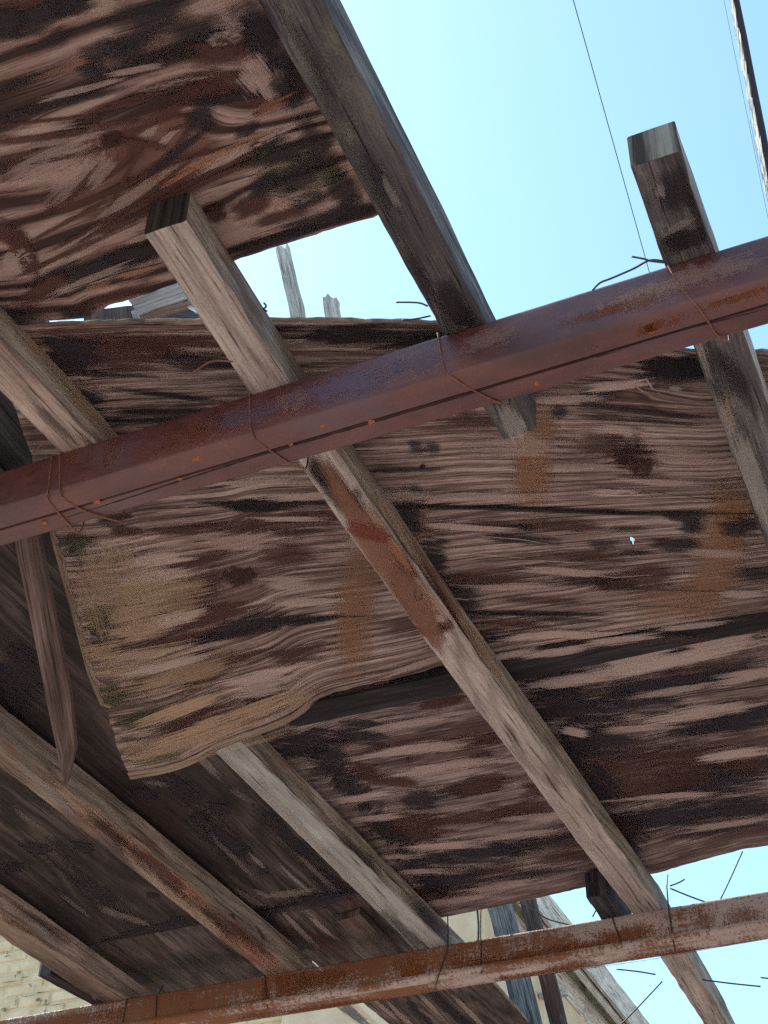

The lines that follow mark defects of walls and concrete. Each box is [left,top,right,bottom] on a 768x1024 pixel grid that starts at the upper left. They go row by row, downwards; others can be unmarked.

rust [396,958,430,978]
rust [446,922,708,981]
rust [30,1008,123,1024]
rust [240,974,393,1020]